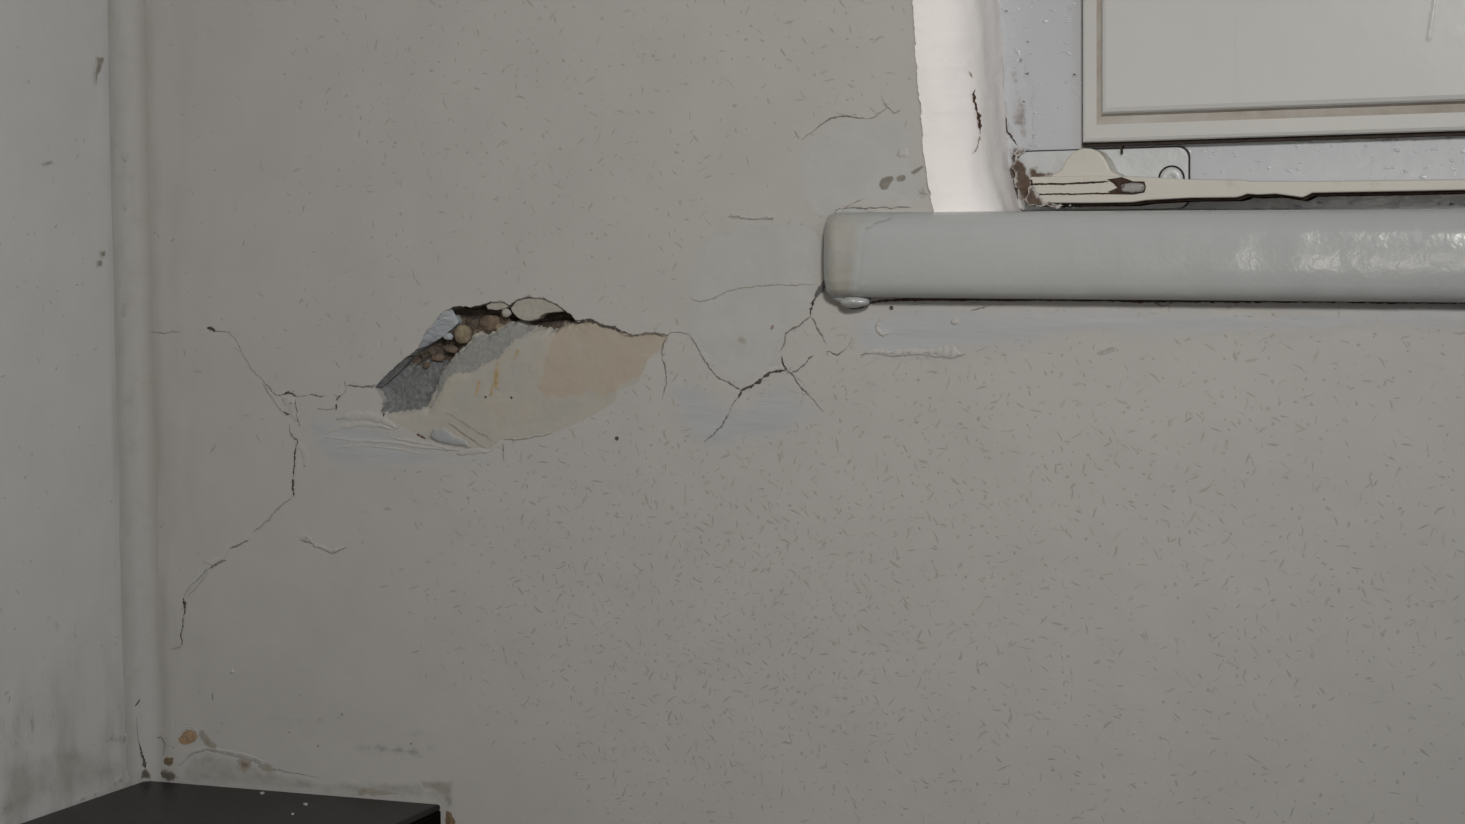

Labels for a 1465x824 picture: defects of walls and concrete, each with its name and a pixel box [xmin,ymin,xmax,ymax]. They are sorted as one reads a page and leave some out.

spalling [325,296,669,459]
crack [669,280,1465,442]
crack [152,327,374,649]